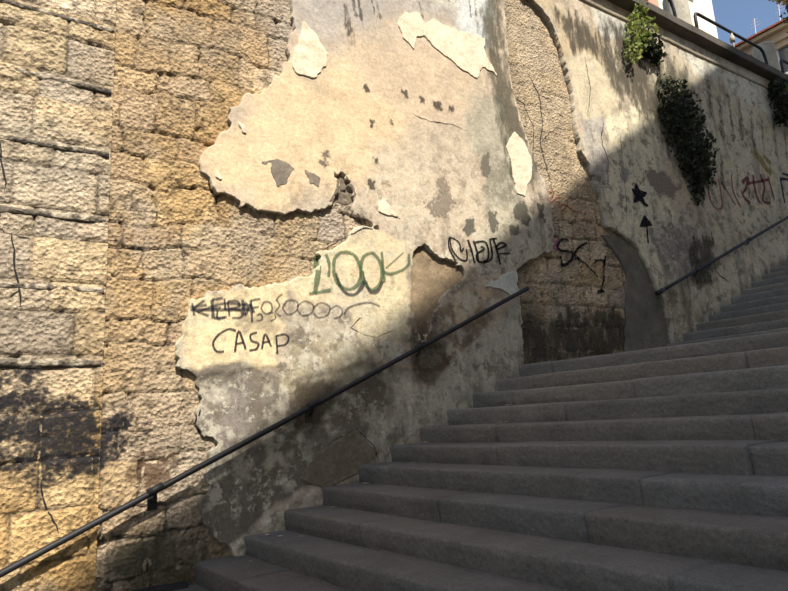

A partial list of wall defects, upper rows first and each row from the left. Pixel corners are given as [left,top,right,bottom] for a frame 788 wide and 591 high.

leakage [343,0,363,44]
peeling [398,12,497,78]
flaking render [419,96,455,111]
crack [0,142,8,193]
crack [516,79,561,197]
flaking render [485,0,626,364]
flaking render [462,218,476,236]
crack [0,214,30,314]
flaking render [95,0,377,591]
flaking render [410,246,463,339]
leakage [519,305,626,363]
crack [40,483,59,534]